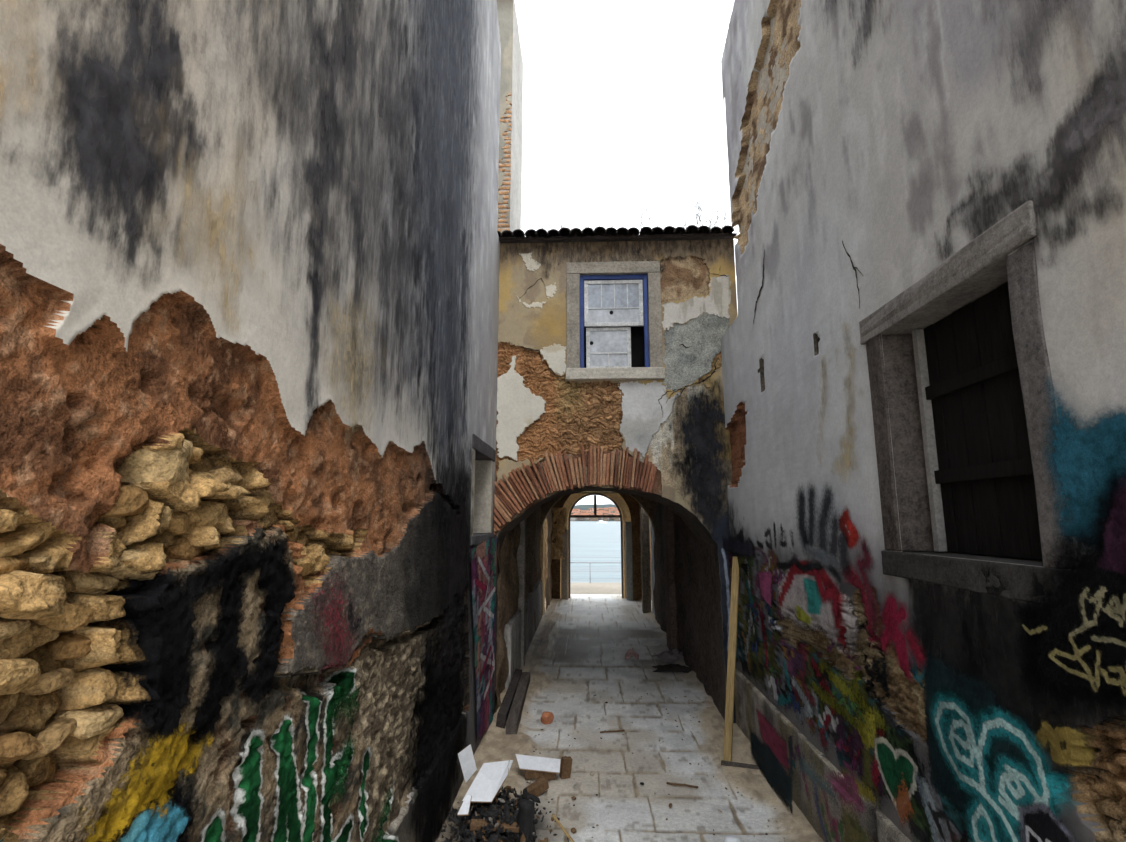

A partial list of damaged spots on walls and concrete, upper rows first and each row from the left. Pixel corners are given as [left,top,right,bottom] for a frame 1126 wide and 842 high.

damp [849,0,875,36]
spalling [731,0,801,255]
damp [1038,52,1126,184]
damp [228,0,478,480]
flaking render [519,252,541,271]
flaking render [517,282,557,308]
spalling [660,255,732,330]
spalling [495,341,722,559]
spalling [0,244,442,842]
spalling [1062,714,1126,842]